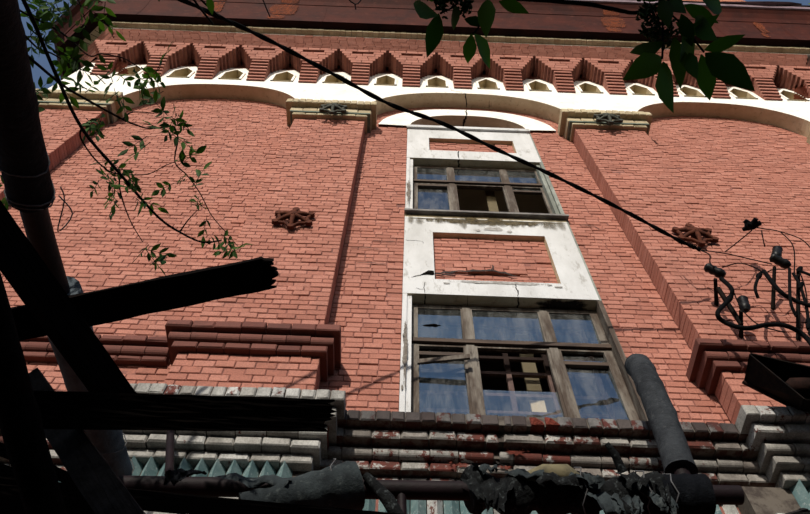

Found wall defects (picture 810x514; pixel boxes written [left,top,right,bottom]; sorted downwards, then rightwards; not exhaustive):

crack [418,265,520,308]
spalling [529,417,560,435]